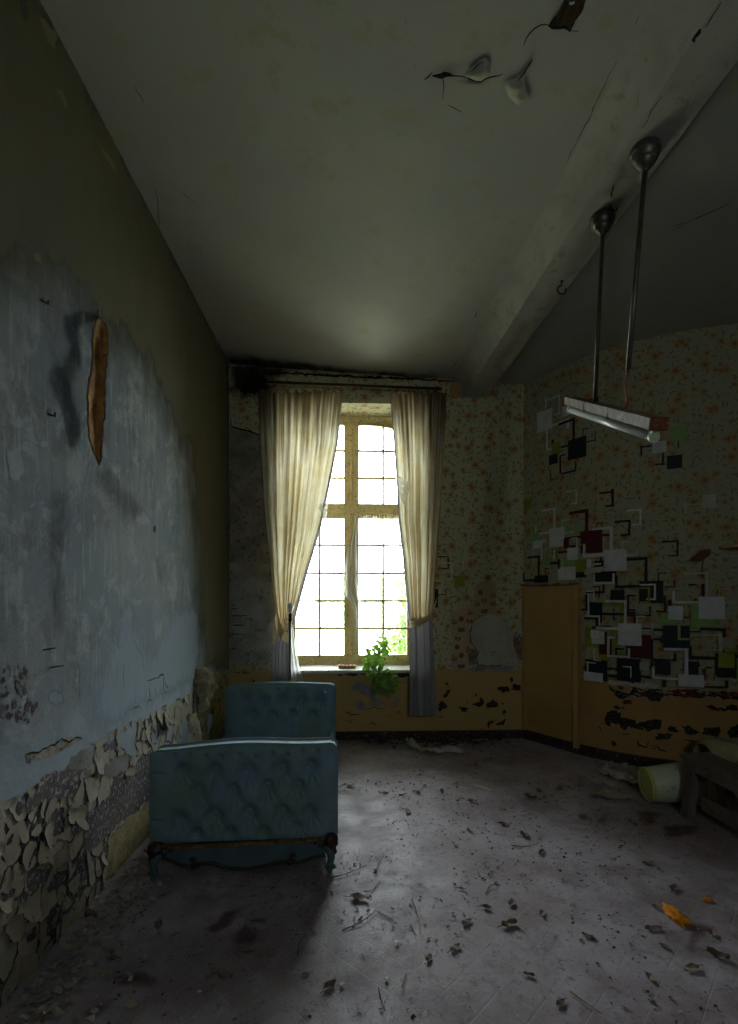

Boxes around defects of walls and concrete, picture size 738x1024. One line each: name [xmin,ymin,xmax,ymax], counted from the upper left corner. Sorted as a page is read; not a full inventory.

flaking render [523,0,586,46]
crack [415,56,533,112]
peeling [437,677,521,730]
peeling [604,686,738,740]
peeling [0,662,230,1007]